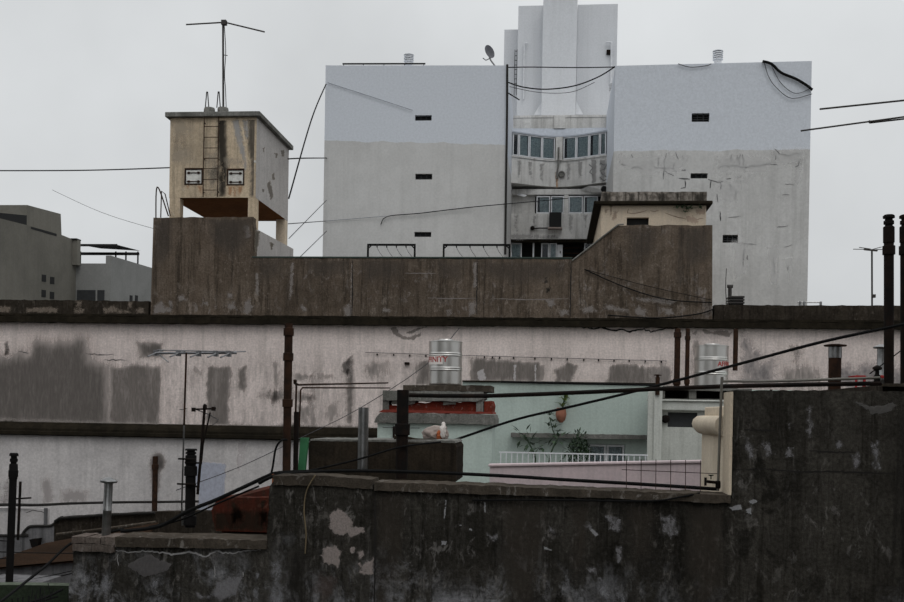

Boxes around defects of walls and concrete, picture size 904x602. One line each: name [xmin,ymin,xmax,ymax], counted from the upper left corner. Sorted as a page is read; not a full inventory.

crack [589,149,799,221]
water stain [0,337,163,424]
water stain [194,365,260,426]
peeling [320,509,374,575]